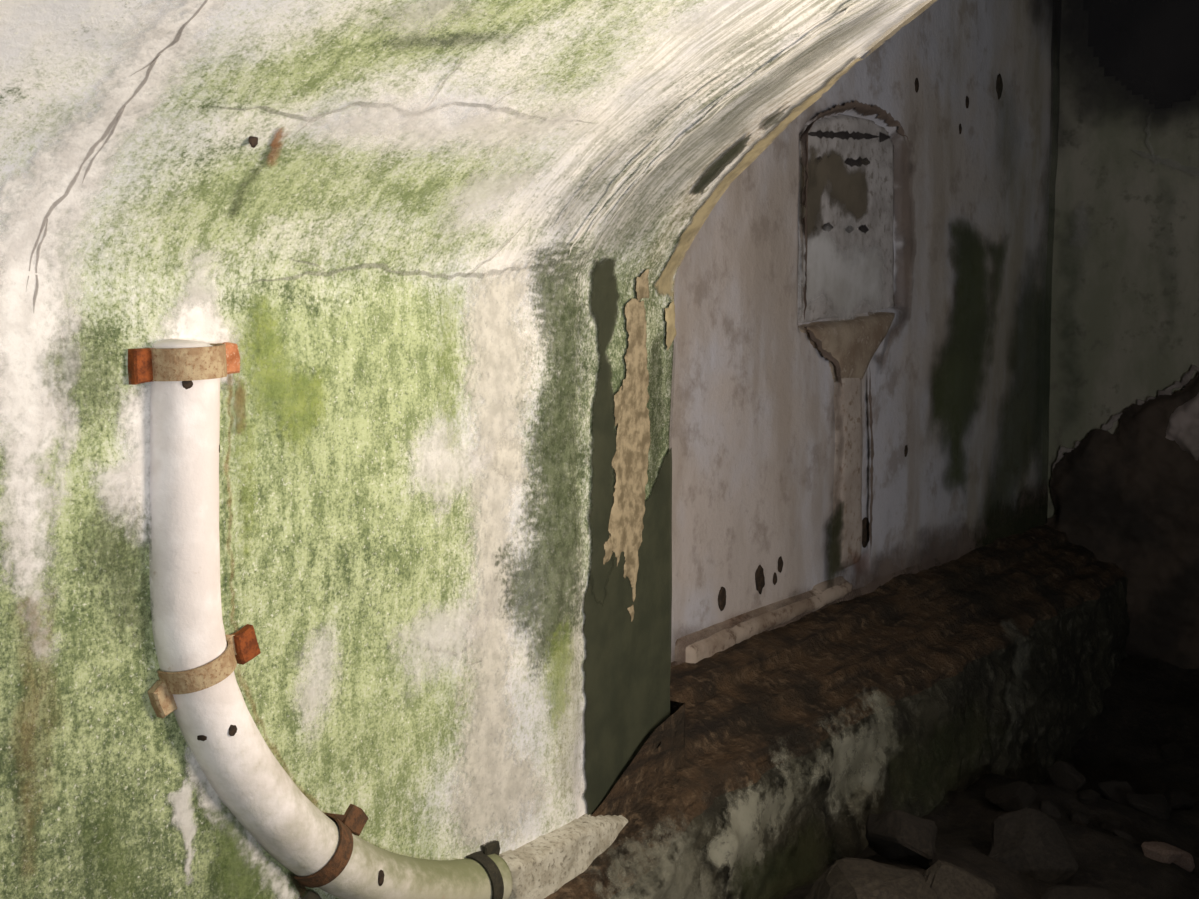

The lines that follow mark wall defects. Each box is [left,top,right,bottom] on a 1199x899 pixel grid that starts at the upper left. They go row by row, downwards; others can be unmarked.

damp [0,0,224,655]
damp [163,260,242,359]
rust [232,128,283,215]
peeling [603,58,862,622]
damp [768,83,1060,631]
damp [417,263,545,845]
flaking render [1045,365,1199,669]
damp [171,749,308,899]
damp [609,691,900,899]